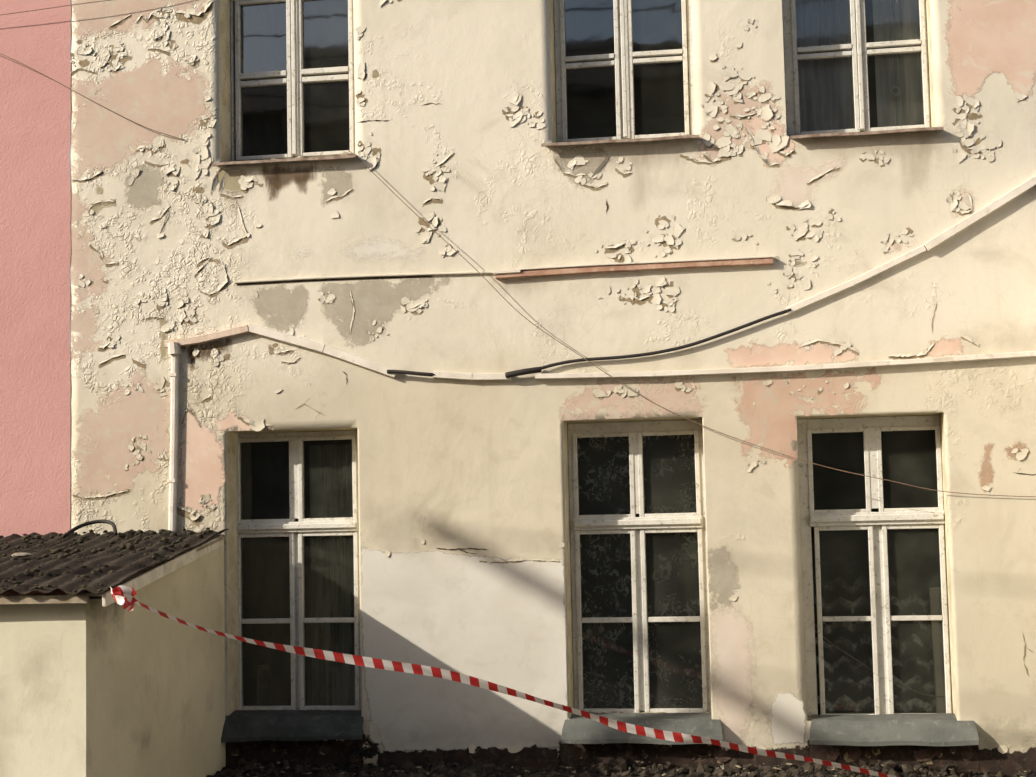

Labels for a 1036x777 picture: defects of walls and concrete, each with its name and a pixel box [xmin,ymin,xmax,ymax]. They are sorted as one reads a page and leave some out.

peeling [945,0,1036,163]
peeling [70,0,274,526]
peeling [319,167,353,218]
peeling [253,276,448,365]
peeling [357,132,381,171]
peeling [414,152,457,257]
peeling [597,276,680,312]
peeling [594,215,685,263]
peeling [680,52,843,293]
peeling [888,336,980,359]
peeling [559,377,702,420]
peeling [725,338,881,472]